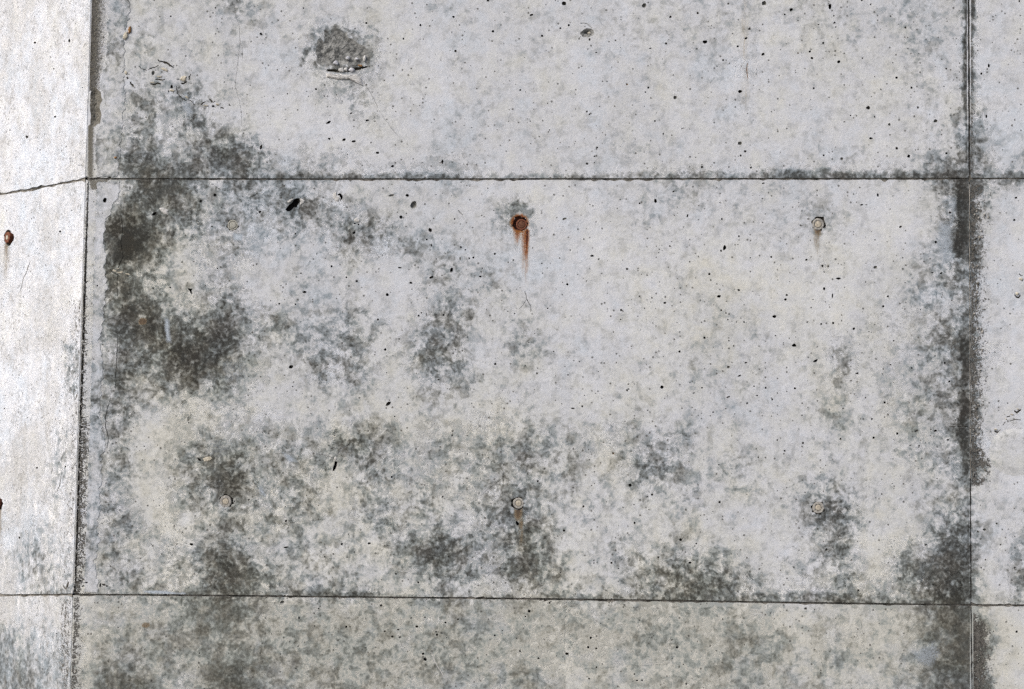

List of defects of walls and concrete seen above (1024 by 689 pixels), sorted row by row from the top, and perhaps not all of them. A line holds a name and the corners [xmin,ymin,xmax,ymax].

spalling [315,30,370,85]
rust [511,214,529,258]
leakage [87,176,970,689]
leakage [118,0,969,480]